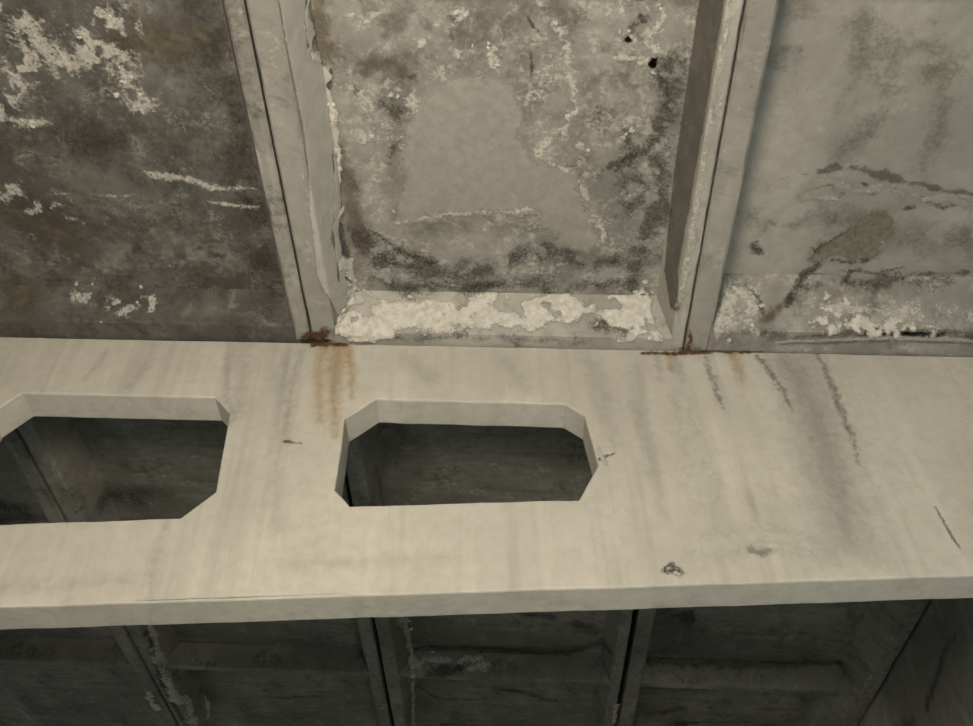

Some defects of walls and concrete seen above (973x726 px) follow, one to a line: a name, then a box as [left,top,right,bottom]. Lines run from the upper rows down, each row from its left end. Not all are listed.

damp [311,4,333,89]
damp [0,0,277,271]
damp [327,102,337,128]
damp [332,0,732,345]
corrosion [297,328,348,347]
corrosion [640,333,763,356]
damp [713,278,787,342]
damp [801,274,973,342]